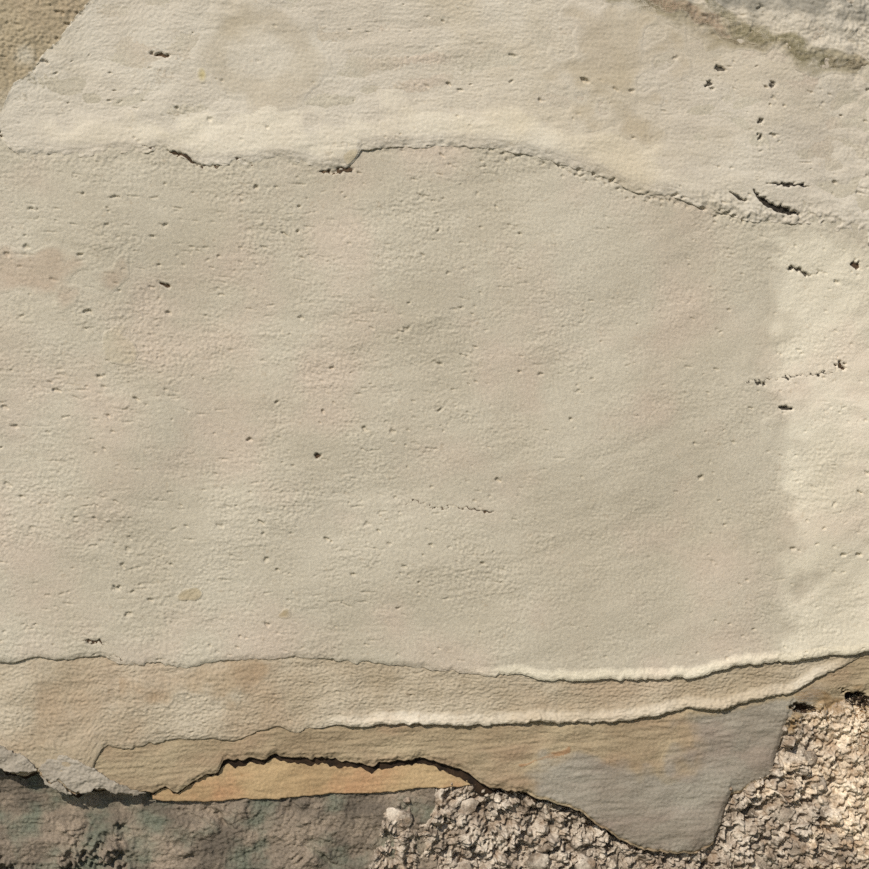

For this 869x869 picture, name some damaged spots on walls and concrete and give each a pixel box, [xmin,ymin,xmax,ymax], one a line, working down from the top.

crack [142,145,253,169]
crack [319,167,353,175]
crack [731,182,806,215]
crack [0,768,39,779]
peeling [0,746,146,796]
crack [70,789,122,798]
crack [144,754,687,854]
spalling [369,695,869,869]